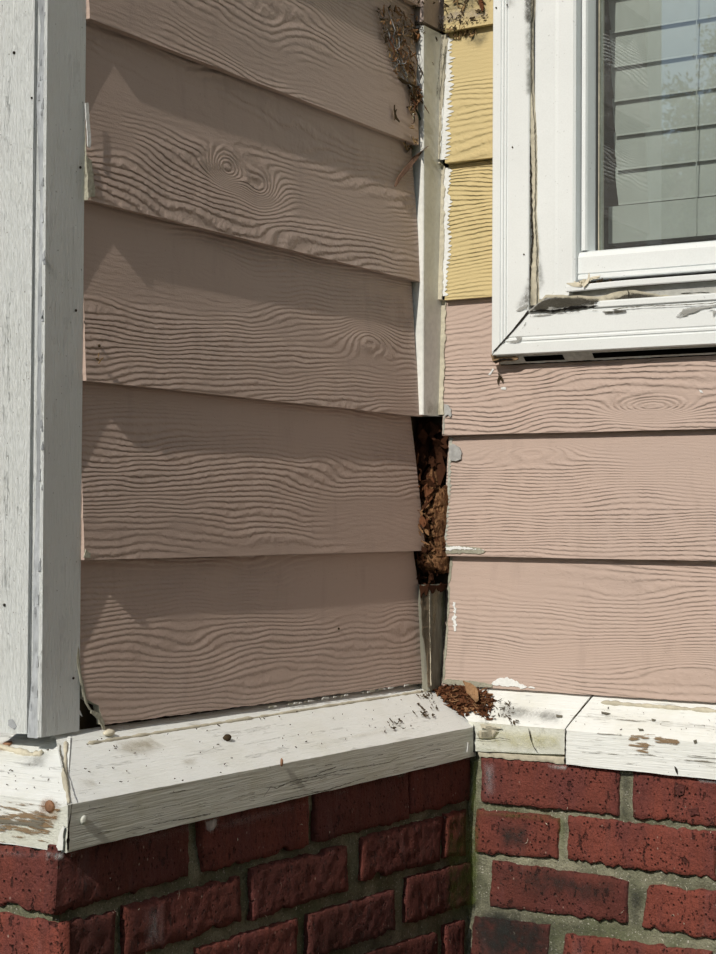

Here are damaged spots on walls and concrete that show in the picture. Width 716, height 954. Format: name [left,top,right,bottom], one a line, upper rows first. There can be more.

peeling [414,452,439,585]
peeling [590,711,680,764]
peeling [0,802,60,843]